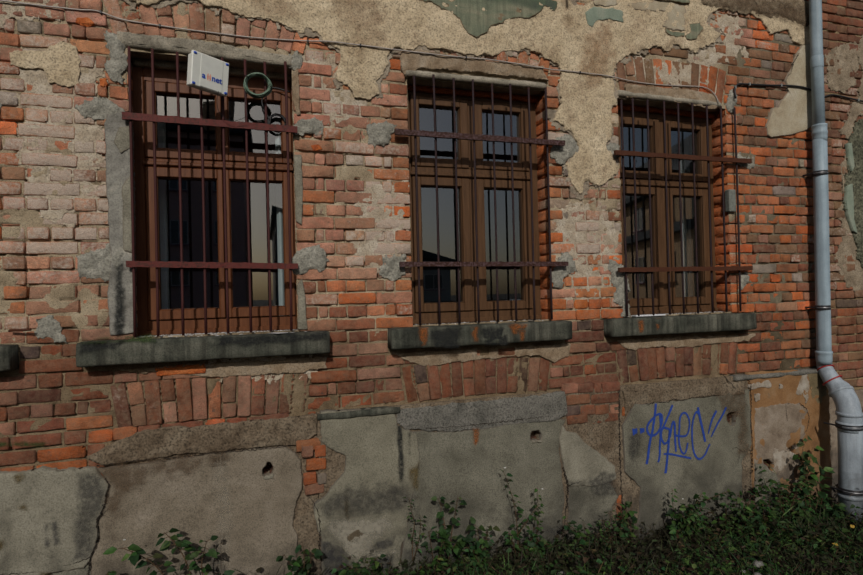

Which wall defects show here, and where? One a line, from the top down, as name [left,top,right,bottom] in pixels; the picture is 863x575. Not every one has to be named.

peeling [9,41,81,87]
peeling [123,0,812,201]
peeling [824,35,863,298]
water stain [323,426,418,575]
peeling [0,369,832,575]